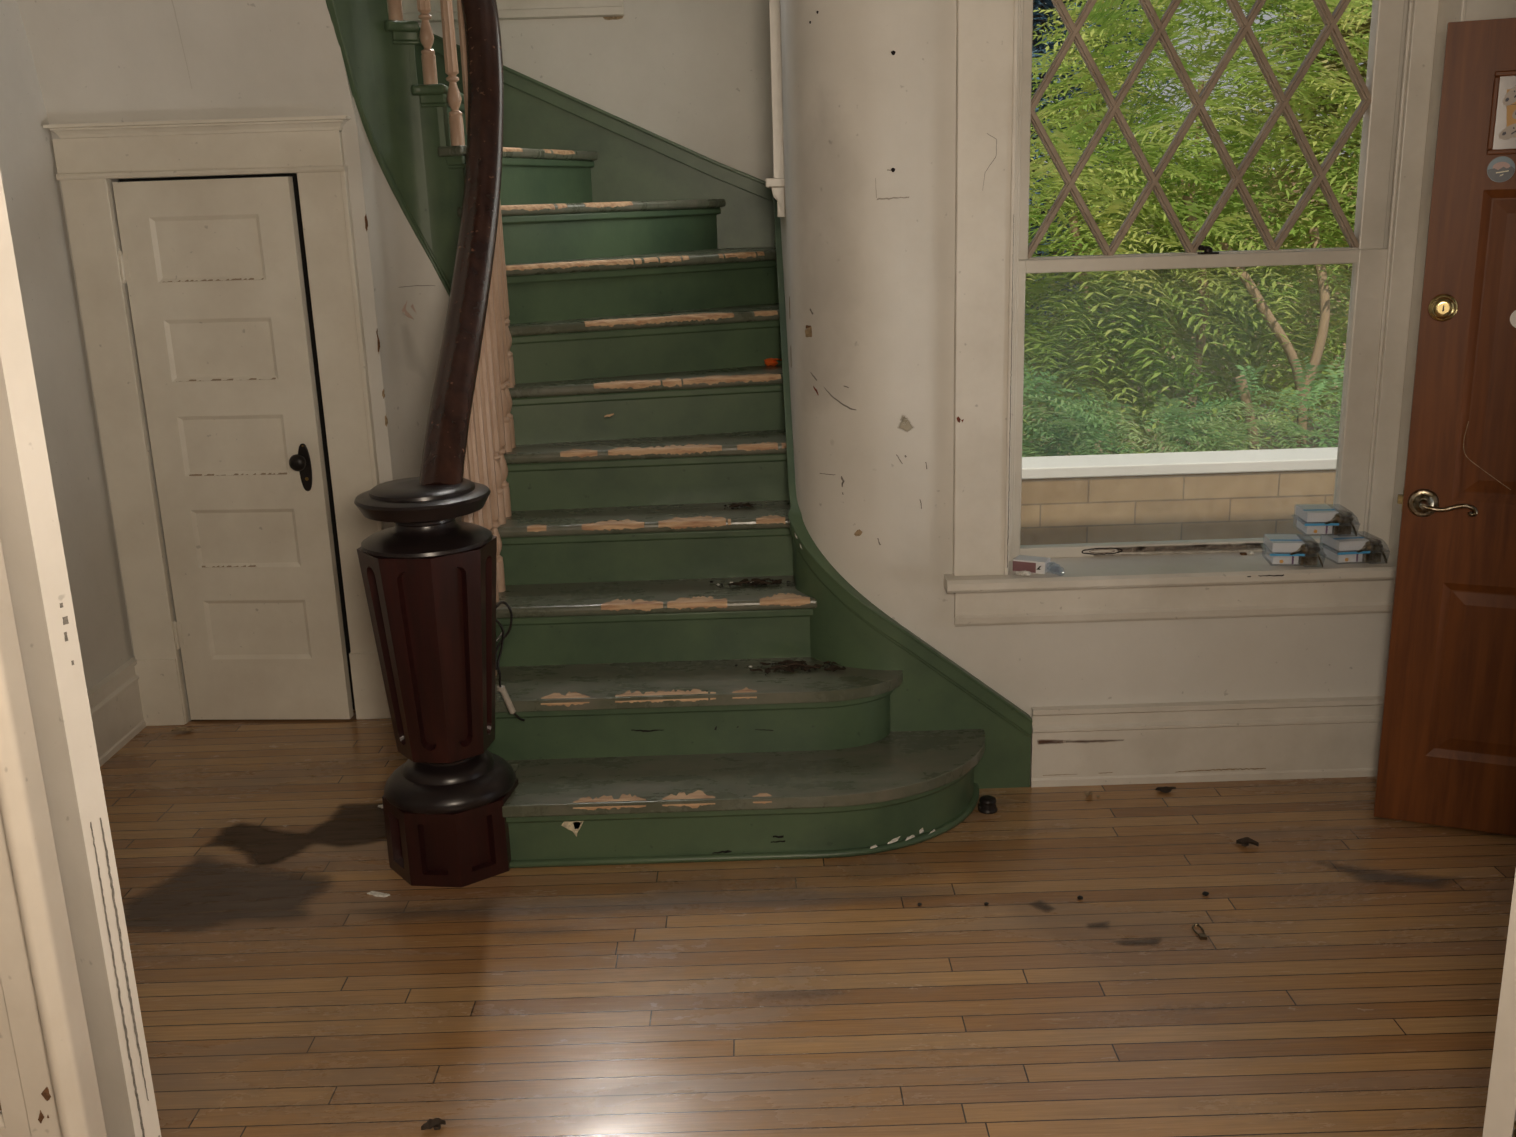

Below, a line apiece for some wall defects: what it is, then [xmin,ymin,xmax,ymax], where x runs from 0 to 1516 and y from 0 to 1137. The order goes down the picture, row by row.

peeling [584,313,734,327]
peeling [594,373,781,389]
peeling [560,442,786,458]
peeling [582,516,731,531]
peeling [756,515,802,549]
peeling [601,581,754,611]
peeling [760,593,810,607]
peeling [541,691,590,707]
peeling [615,687,757,703]
peeling [561,790,715,837]
peeling [870,828,936,849]
leakage [125,803,387,929]